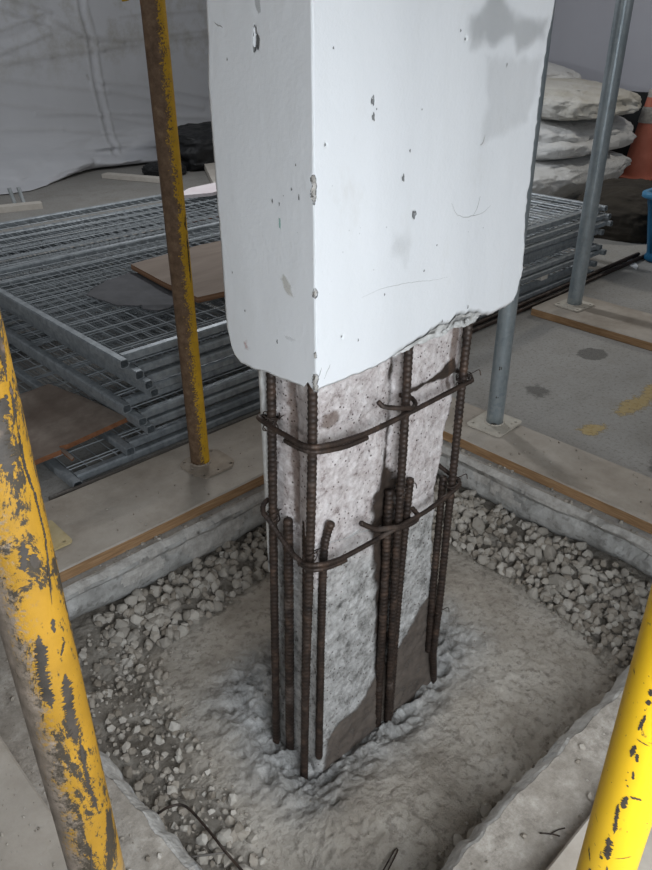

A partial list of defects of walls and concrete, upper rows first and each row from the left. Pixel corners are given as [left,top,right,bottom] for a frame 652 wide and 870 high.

corrosion [411,358,456,392]
corrosion [371,416,397,671]